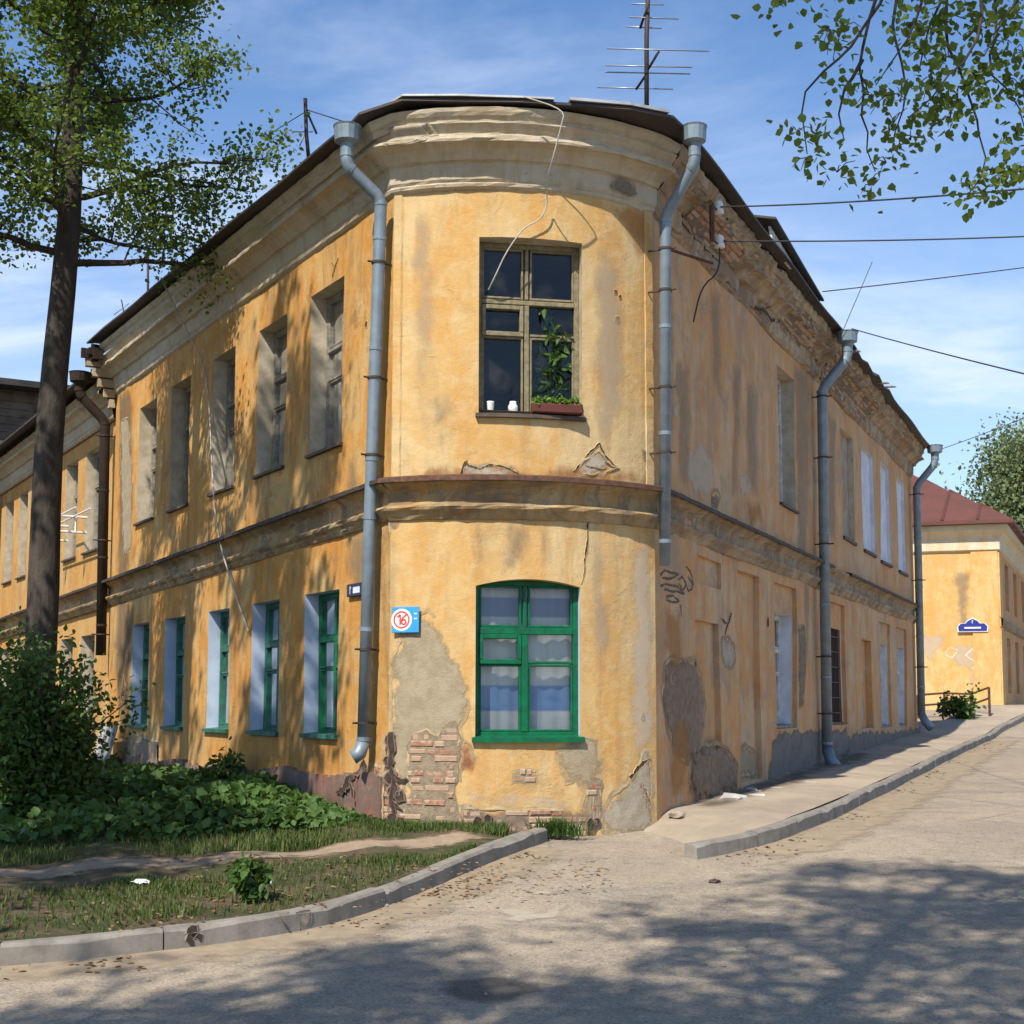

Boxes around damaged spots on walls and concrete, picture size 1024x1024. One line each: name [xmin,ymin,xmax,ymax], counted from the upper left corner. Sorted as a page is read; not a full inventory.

flaking render [682,203,747,266]
flaking render [779,307,821,348]
flaking render [821,348,880,424]
peeling [459,462,522,474]
flaking render [574,448,620,478]
crack [581,522,589,583]
peeling [360,548,756,837]